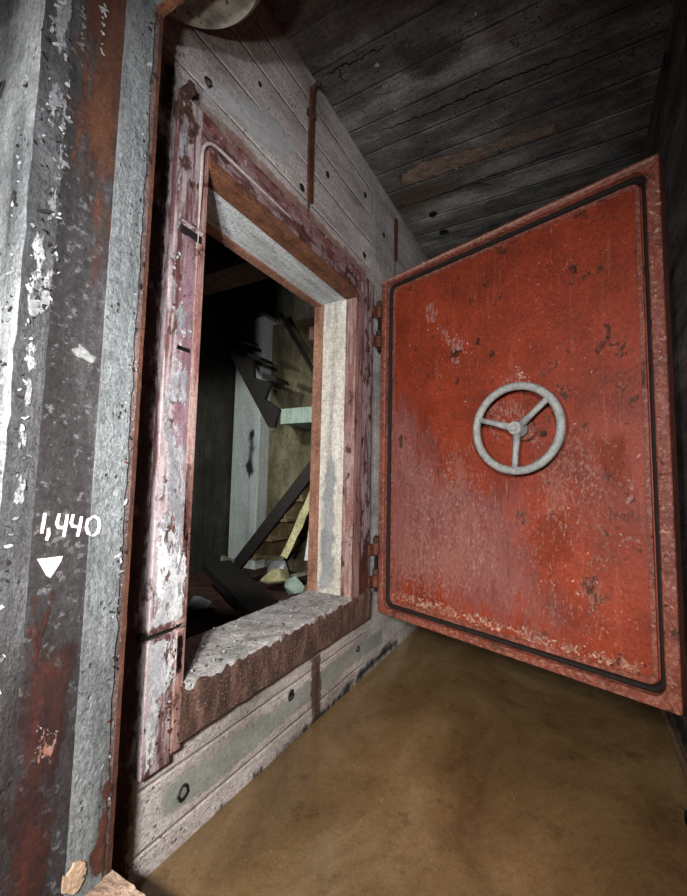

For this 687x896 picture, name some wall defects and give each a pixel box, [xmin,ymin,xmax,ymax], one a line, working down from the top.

rust [72,0,127,177]
crack [321,45,385,84]
spalling [10,115,22,217]
peeling [25,77,73,326]
peeling [179,118,189,159]
rust [208,130,365,300]
spalling [398,122,558,186]
peeling [15,337,36,405]
peeling [14,416,33,459]
peeling [152,212,195,628]
peeling [14,474,26,504]
peeling [392,588,647,675]